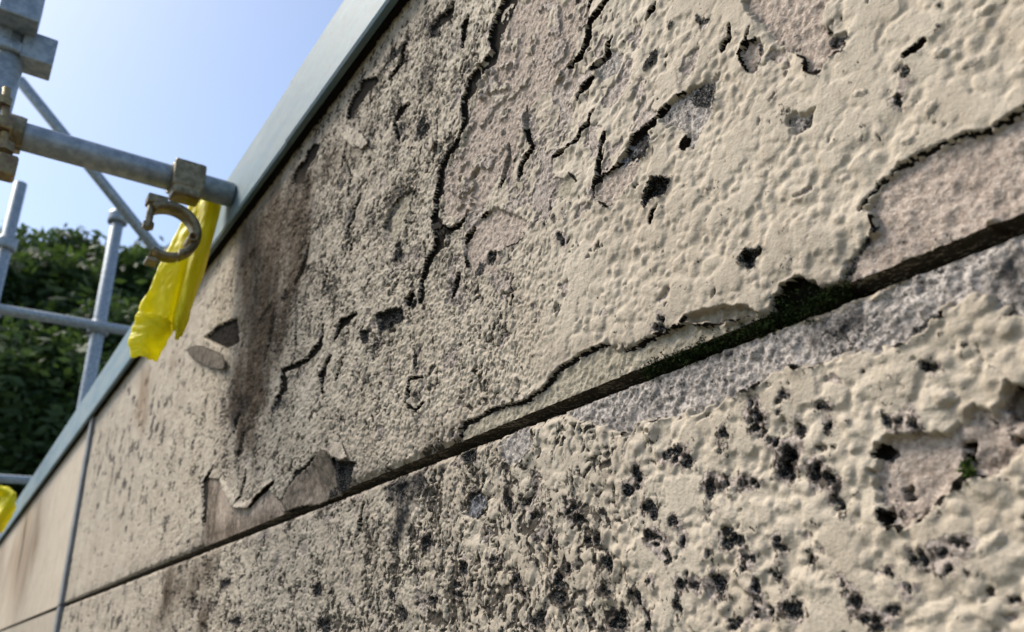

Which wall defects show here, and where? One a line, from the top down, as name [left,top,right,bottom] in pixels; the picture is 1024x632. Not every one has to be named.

crack [292,0,518,305]
crack [474,0,672,198]
peeling [595,134,672,224]
peeling [772,104,1024,315]
spalling [186,319,240,370]
water stain [228,181,311,450]
peeling [205,441,356,546]
crack [263,307,358,409]
crack [404,375,424,413]
spalling [458,234,1024,481]
peeling [870,385,1024,533]
hole [722,525,803,630]